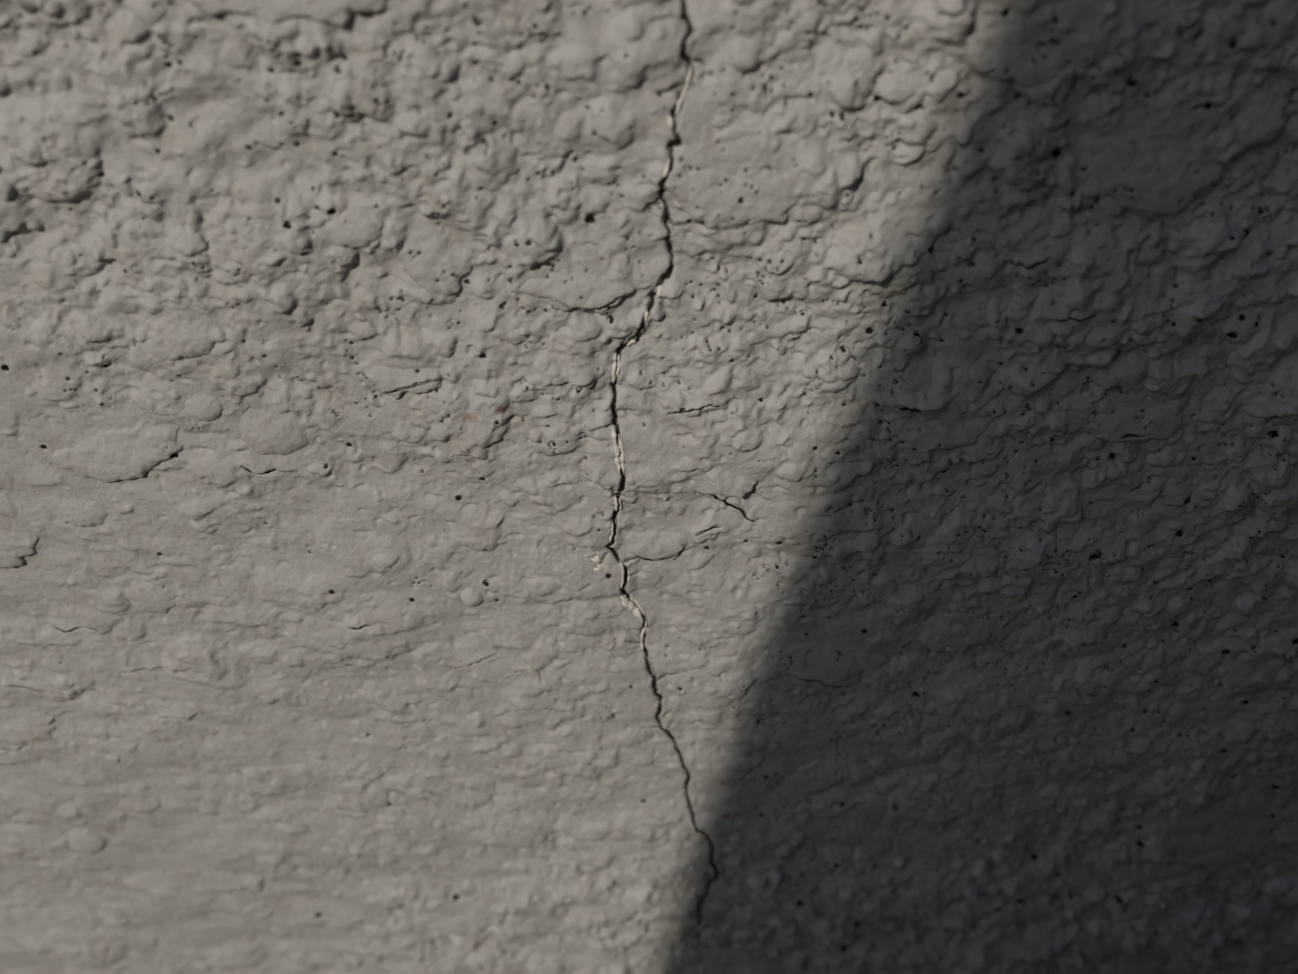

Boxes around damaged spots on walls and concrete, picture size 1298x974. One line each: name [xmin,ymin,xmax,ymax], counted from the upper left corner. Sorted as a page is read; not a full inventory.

crack [552,0,756,956]